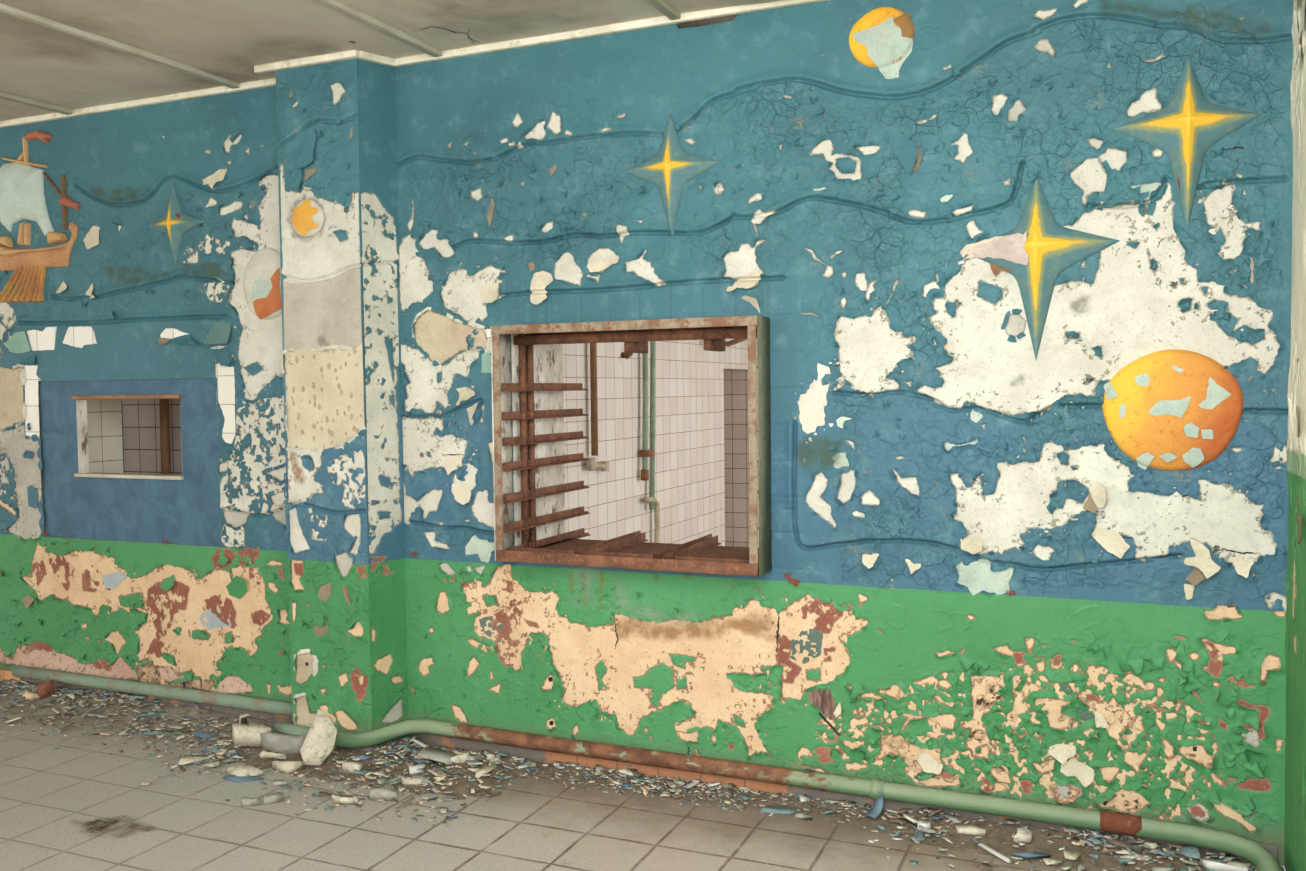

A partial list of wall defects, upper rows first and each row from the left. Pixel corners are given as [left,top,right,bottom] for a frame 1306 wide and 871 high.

peeling [331,83,346,105]
peeling [974,72,1074,145]
peeling [1122,88,1169,117]
peeling [456,112,667,305]
peeling [699,163,776,313]
peeling [0,128,514,731]
peeling [779,110,1302,620]
peeling [424,522,1286,837]